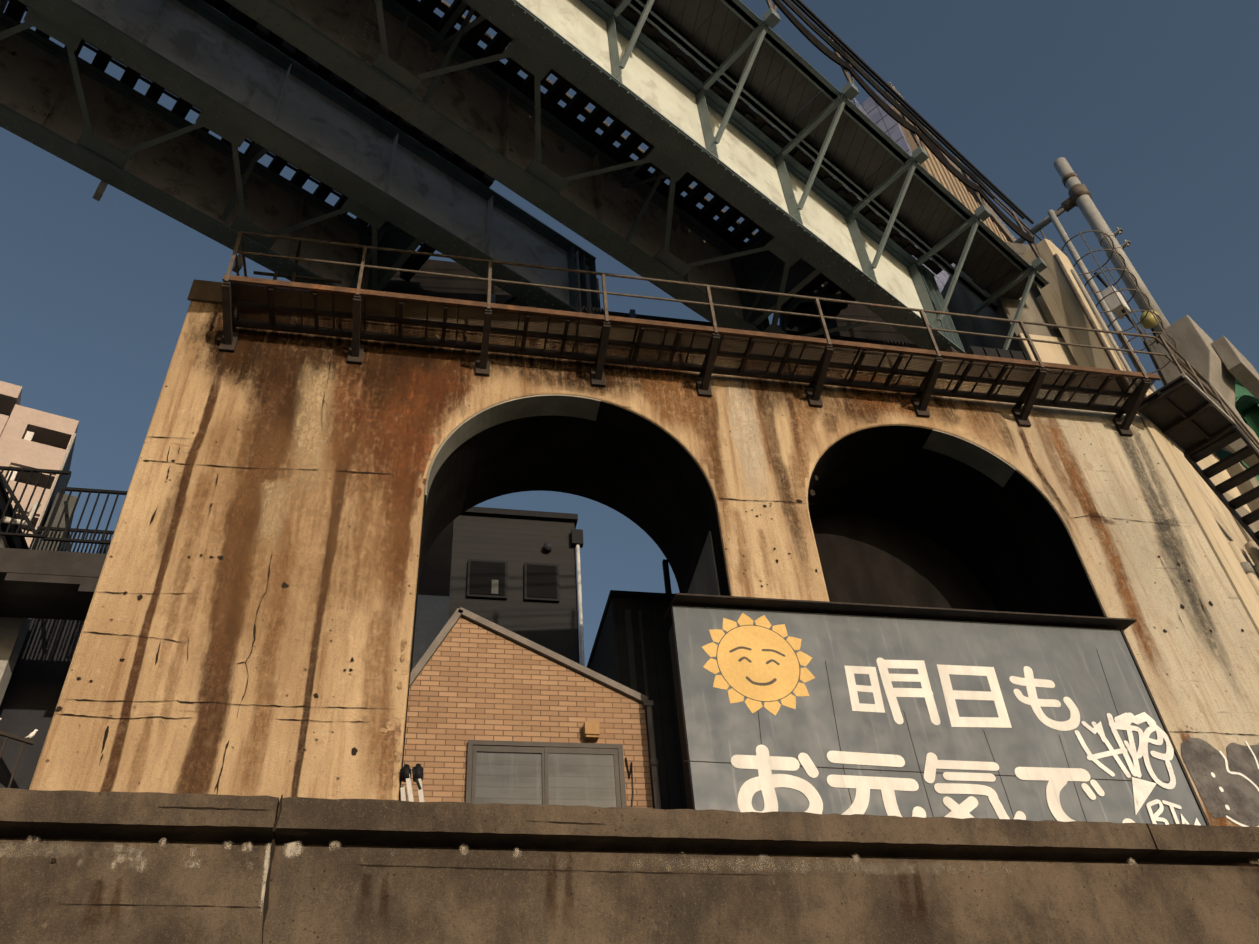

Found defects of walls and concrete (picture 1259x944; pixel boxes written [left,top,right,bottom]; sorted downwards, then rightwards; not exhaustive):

corrosion [100,383,219,792]
corrosion [176,359,305,794]
corrosion [639,367,723,500]
corrosion [758,390,806,524]
corrosion [841,375,956,422]
corrosion [1004,419,1153,653]
leakage [1118,433,1216,647]
crack [59,549,386,944]
crack [350,864,790,876]